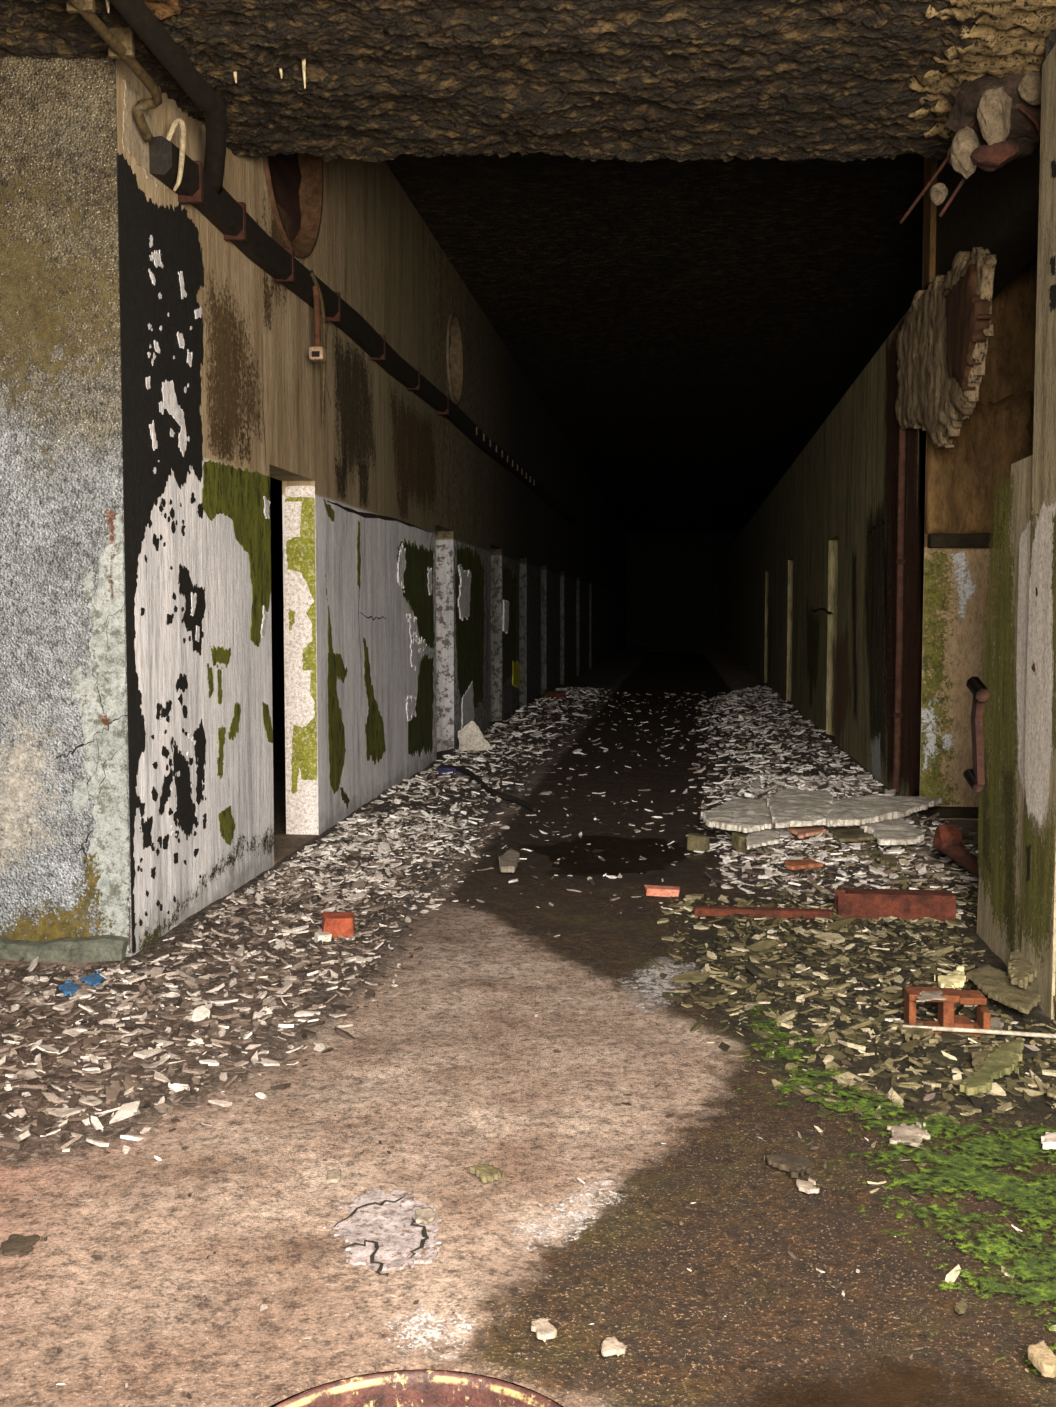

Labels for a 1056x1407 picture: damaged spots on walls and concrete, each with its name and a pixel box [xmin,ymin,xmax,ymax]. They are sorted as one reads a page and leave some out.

spalling [900,0,1056,224]
spalling [0,75,386,957]
peeling [397,538,434,757]
peeling [455,544,485,729]
peeling [502,558,517,685]